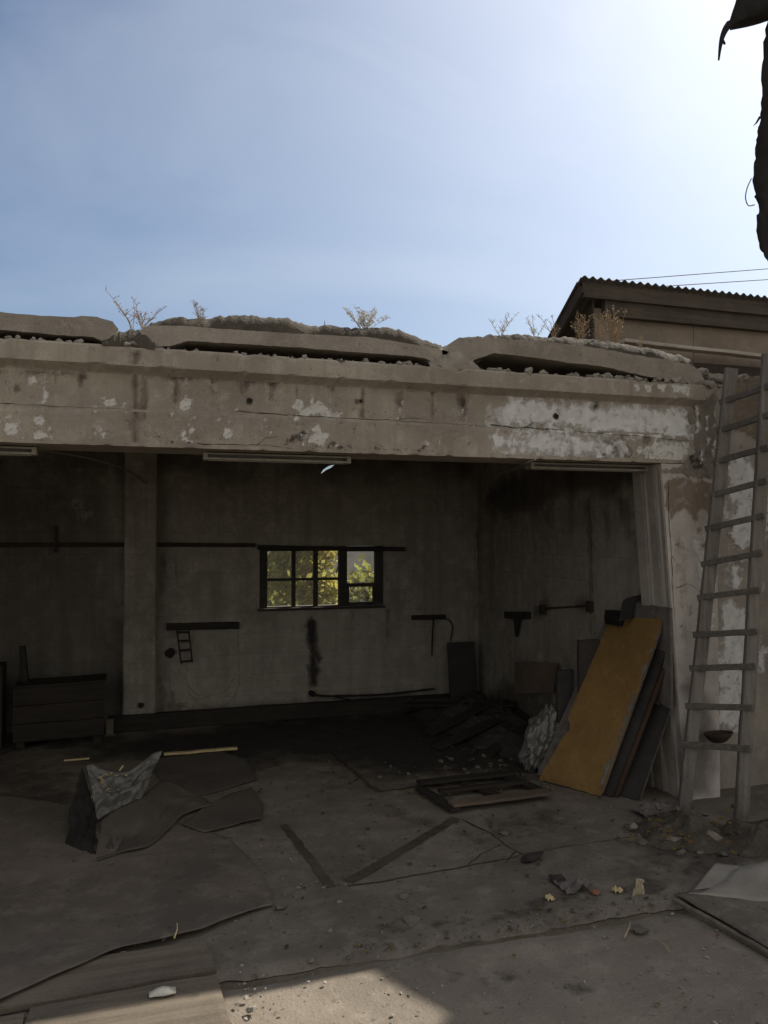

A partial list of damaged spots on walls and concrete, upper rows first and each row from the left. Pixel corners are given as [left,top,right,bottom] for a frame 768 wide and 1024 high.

peeling [0,375,52,440]
peeling [171,382,196,443]
peeling [289,398,343,447]
crack [187,411,691,449]
peeling [473,383,718,580]
peeling [711,456,754,734]
leakage [307,619,320,686]
peeling [757,640,768,673]
crack [348,819,635,886]